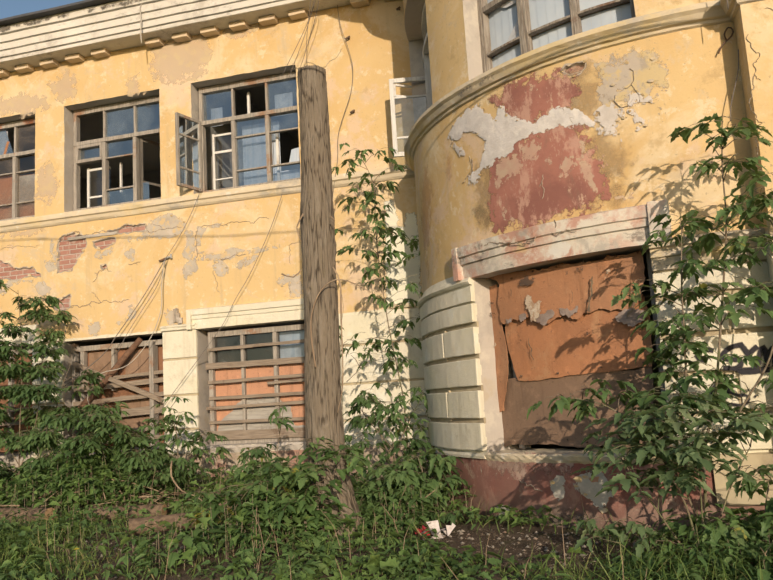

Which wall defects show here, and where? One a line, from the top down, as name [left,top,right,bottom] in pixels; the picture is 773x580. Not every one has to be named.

peeling [448,46,669,235]
crack [746,35,762,155]
spalling [0,213,281,311]
peeling [276,274,303,298]
peeling [550,471,613,513]